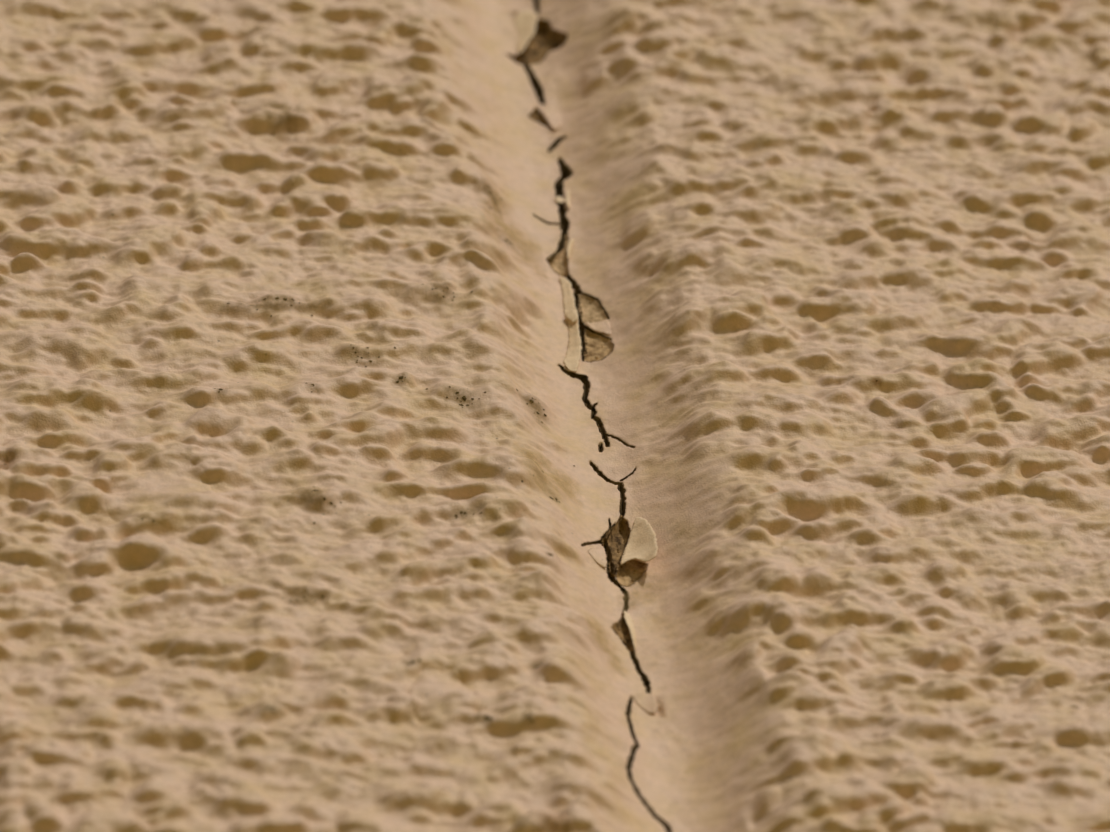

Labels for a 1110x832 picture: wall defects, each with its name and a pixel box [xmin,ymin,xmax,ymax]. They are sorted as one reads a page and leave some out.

crack [532,0,540,15]
spalling [506,10,567,70]
crack [522,61,545,105]
peeling [548,234,614,372]
crack [533,136,636,612]
peeling [588,515,658,587]
crack [625,651,671,832]